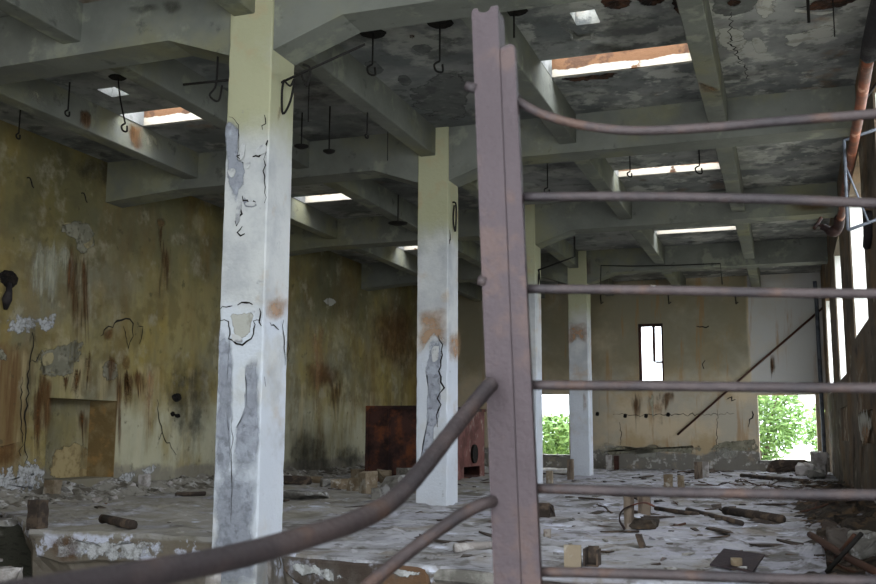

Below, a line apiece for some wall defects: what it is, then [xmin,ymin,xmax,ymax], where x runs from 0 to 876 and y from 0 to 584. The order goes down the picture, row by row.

spalling [601,0,680,15]
crack [727,12,748,79]
spalling [712,0,775,18]
peeling [785,0,856,47]
peeling [226,117,268,237]
corrosion [67,253,88,325]
damp [7,313,56,334]
corrosion [421,316,442,344]
crack [19,332,41,462]
corrosion [34,372,51,437]
peeling [216,313,259,547]
peeling [421,335,445,456]